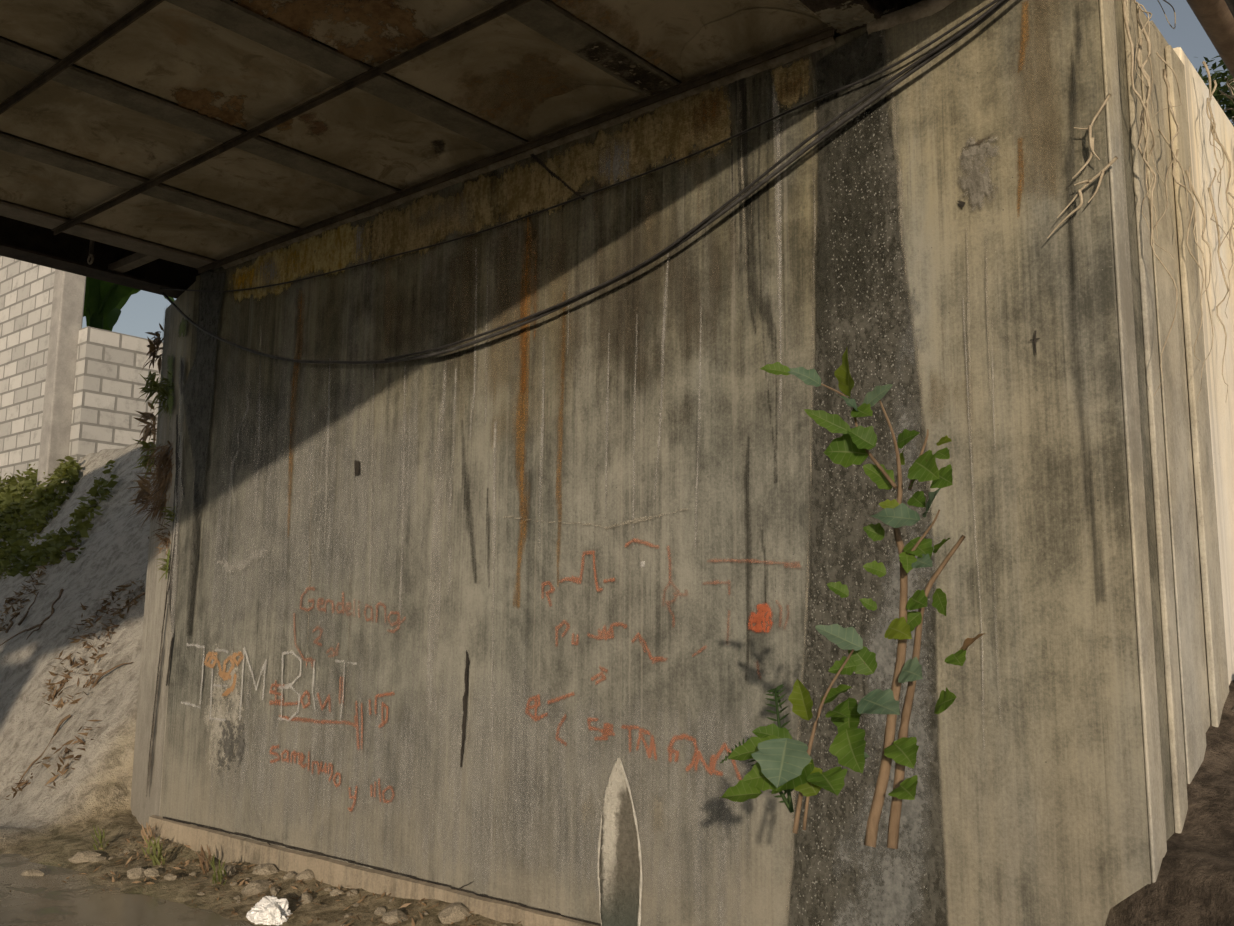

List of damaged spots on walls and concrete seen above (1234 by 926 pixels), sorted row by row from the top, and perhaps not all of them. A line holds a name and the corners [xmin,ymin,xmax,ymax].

crack [147,381,185,787]
crack [163,817,601,926]
crack [460,650,470,767]
corrosion [516,212,536,607]
damp [168,1,948,926]